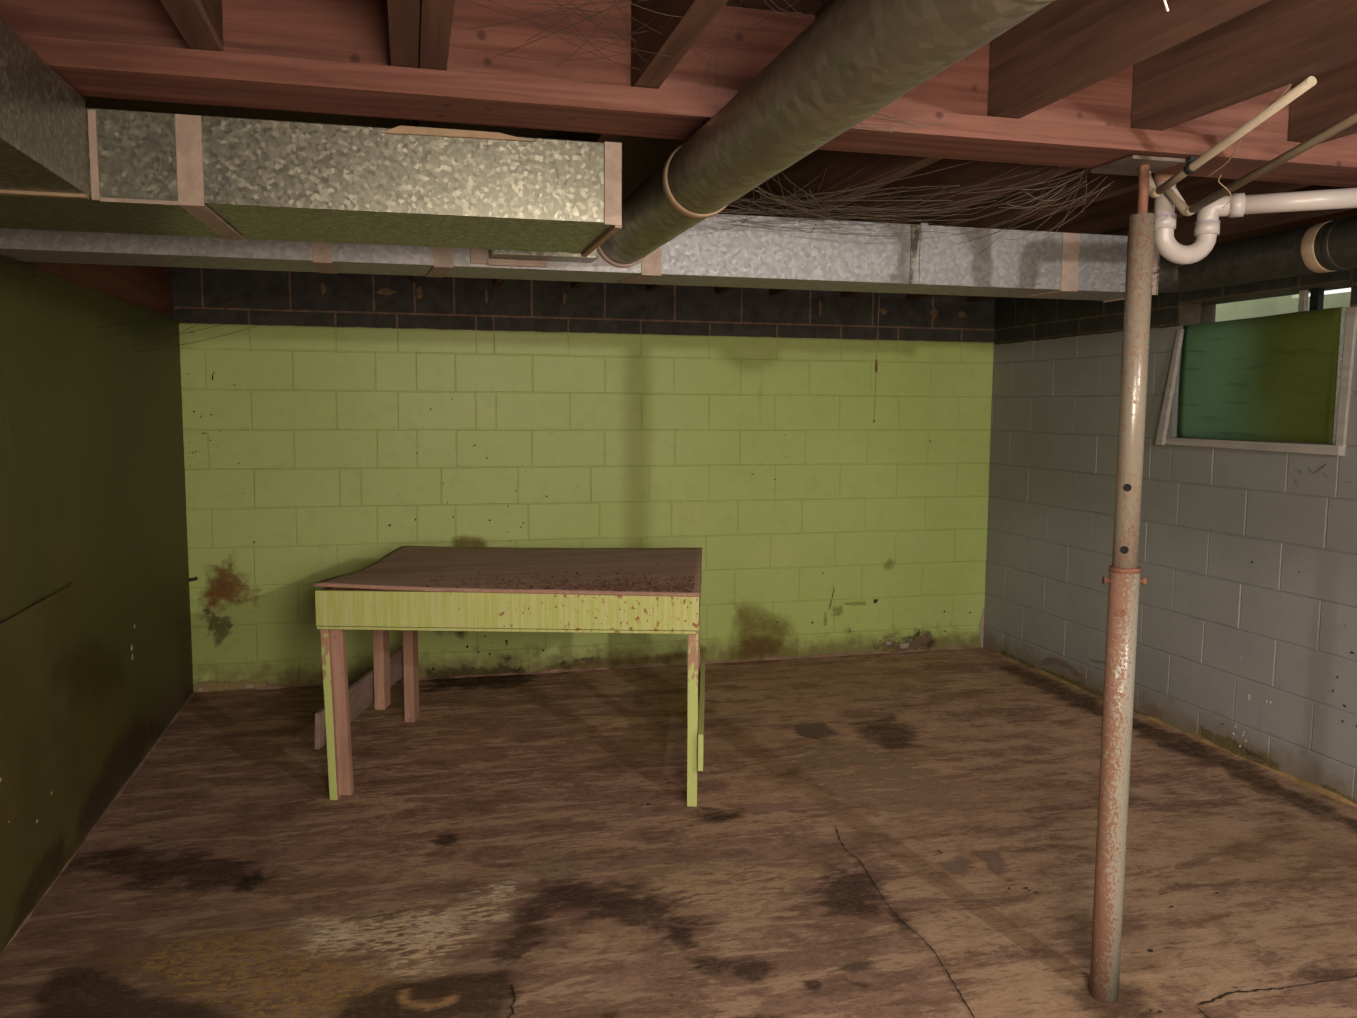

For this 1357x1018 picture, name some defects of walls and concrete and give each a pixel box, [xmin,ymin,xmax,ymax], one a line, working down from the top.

rust [204,564,248,641]
damp [738,609,785,657]
damp [1000,650,1103,716]
damp [1132,706,1357,830]
damp [70,848,264,891]
damp [499,881,771,980]
damp [342,973,512,1018]
crack [1197,975,1357,1018]